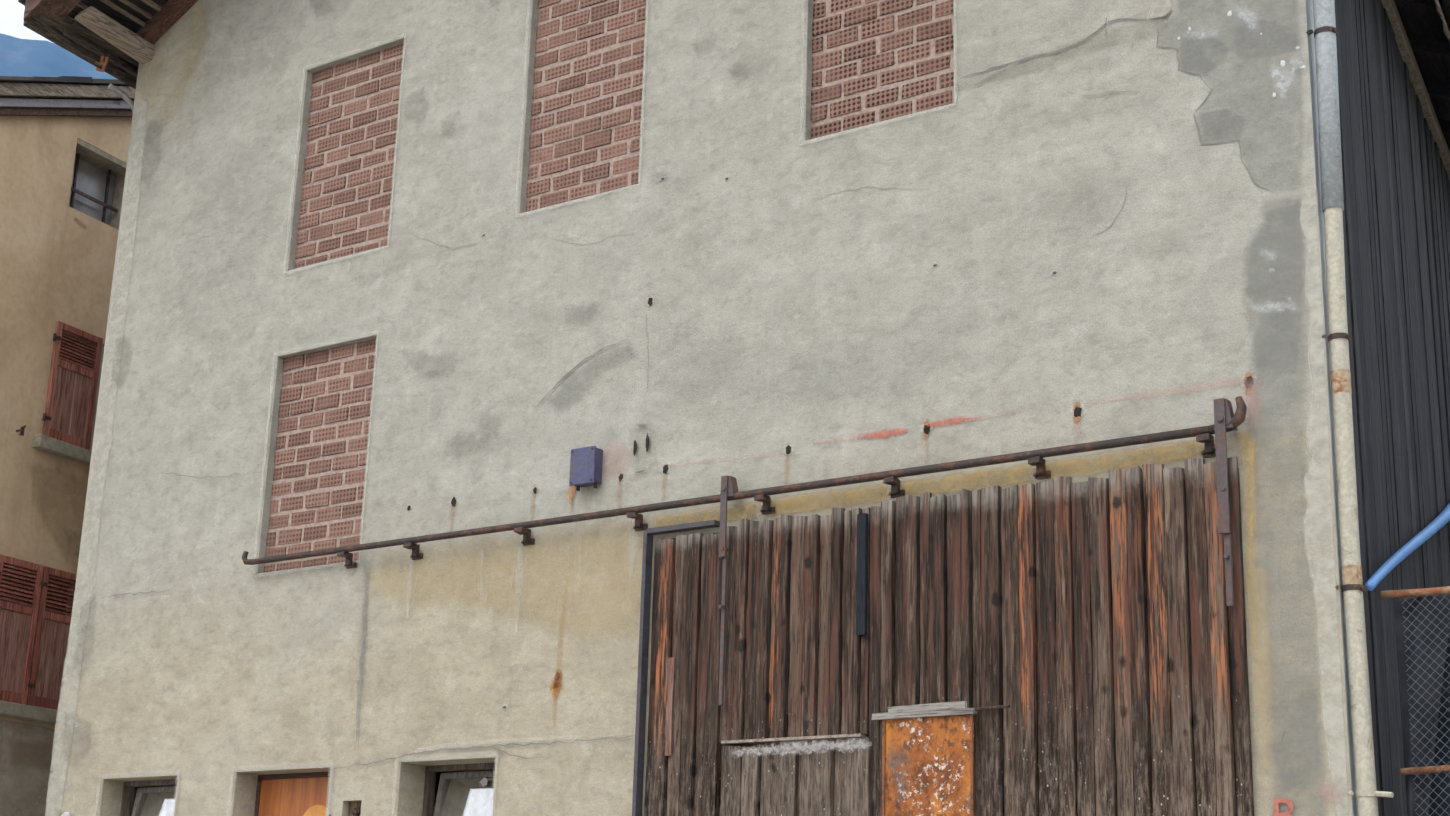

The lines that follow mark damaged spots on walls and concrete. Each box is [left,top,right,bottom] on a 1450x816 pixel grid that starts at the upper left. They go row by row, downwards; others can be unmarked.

crack [963,10,1171,85]
corrosion [655,441,1204,527]
corrosion [551,671,562,698]